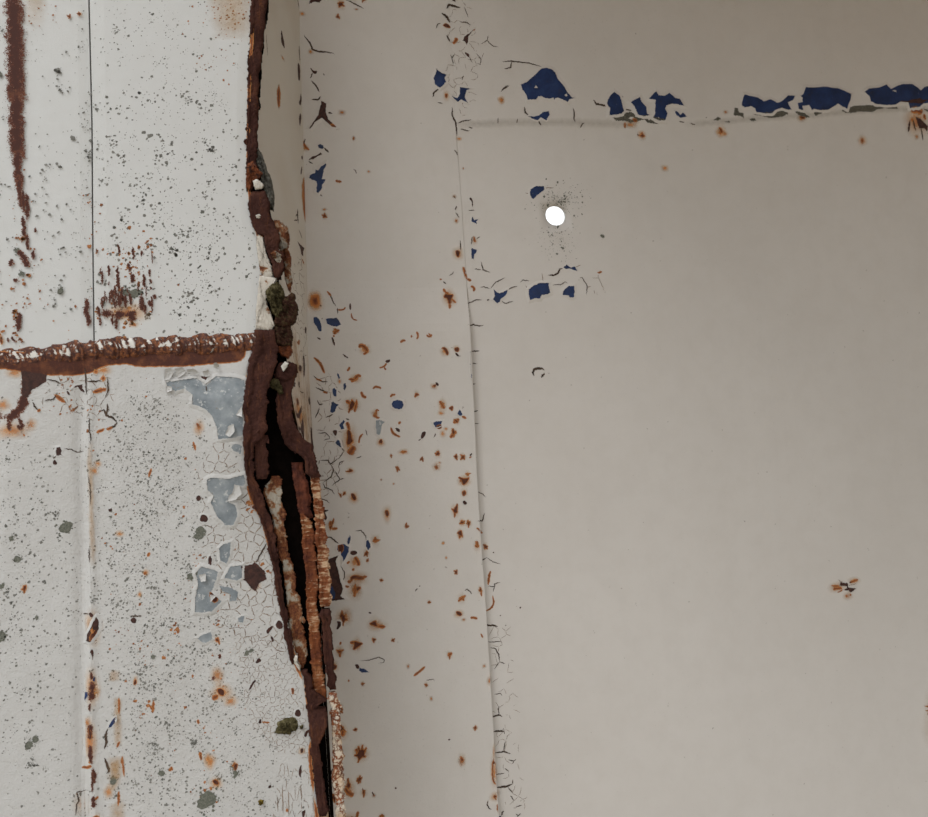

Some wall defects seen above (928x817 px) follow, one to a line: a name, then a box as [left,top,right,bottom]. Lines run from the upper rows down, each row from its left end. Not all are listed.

crack [436,0,521,155]
peeling [507,61,577,125]
peeling [706,81,928,123]
corrosion [0,0,246,436]
peeling [162,363,247,457]
crack [198,0,361,817]
corrosion [346,386,381,455]
peeling [191,471,267,617]
corrosion [451,473,488,549]
crack [465,557,500,594]
corrosion [82,671,120,817]
crack [486,624,527,816]